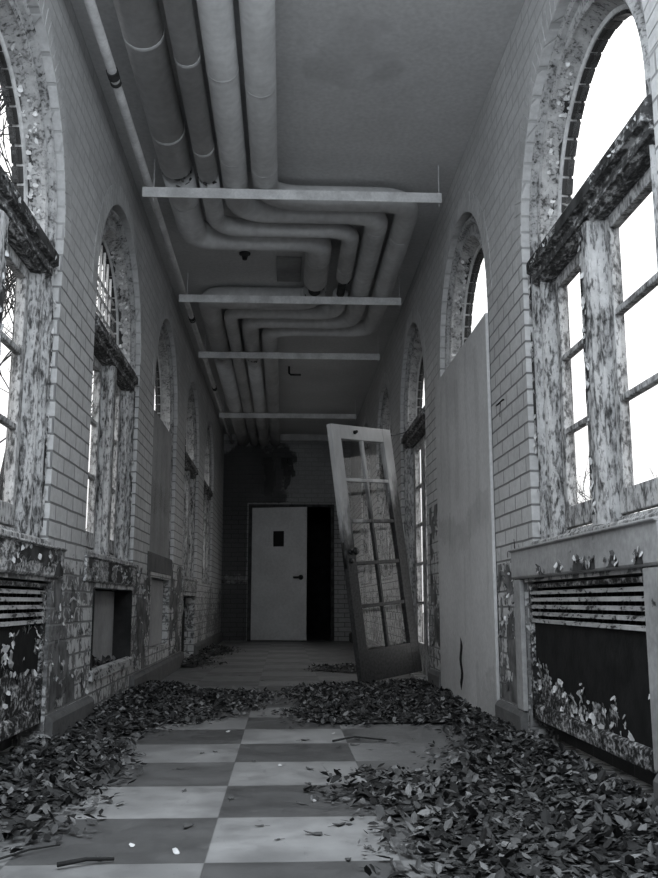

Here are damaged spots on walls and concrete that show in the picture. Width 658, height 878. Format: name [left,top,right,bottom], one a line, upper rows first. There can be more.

peeling [556,53,582,119]
peeling [0,227,9,355]
peeling [48,298,57,402]
peeling [526,116,636,454]
peeling [40,413,50,532]
peeling [0,537,92,712]
peeling [89,476,151,670]
peeling [169,564,189,656]
peeling [497,563,518,704]
peeling [535,550,618,575]
peeling [535,623,653,748]
peeling [631,547,643,565]